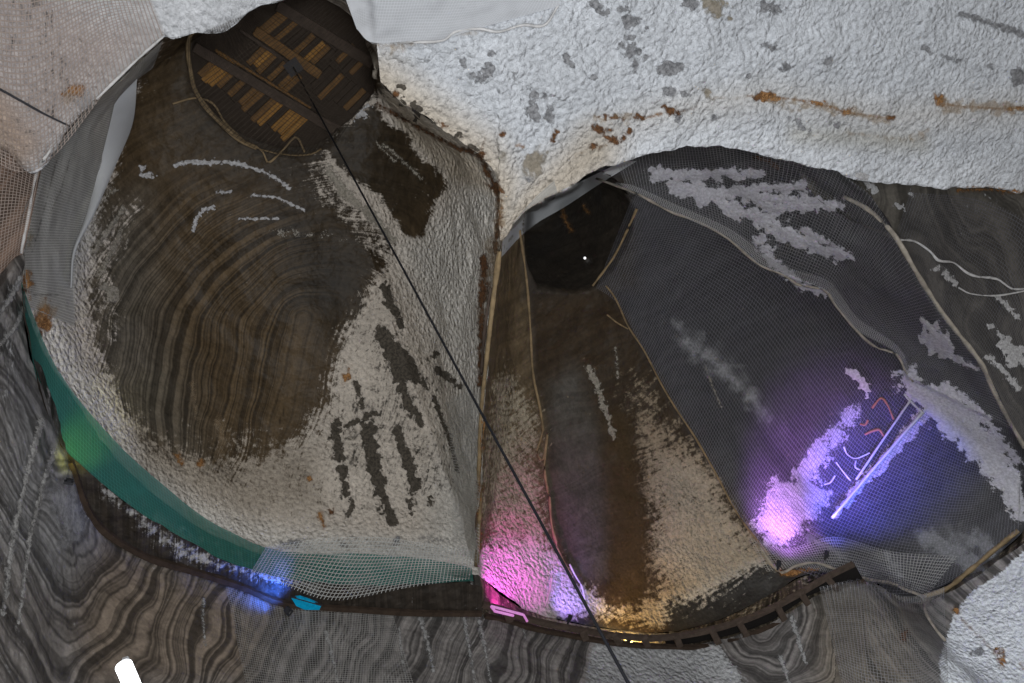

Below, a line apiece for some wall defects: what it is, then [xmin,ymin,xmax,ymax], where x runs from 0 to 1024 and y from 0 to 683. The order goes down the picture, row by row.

rust [753,91,781,102]
rust [589,104,680,150]